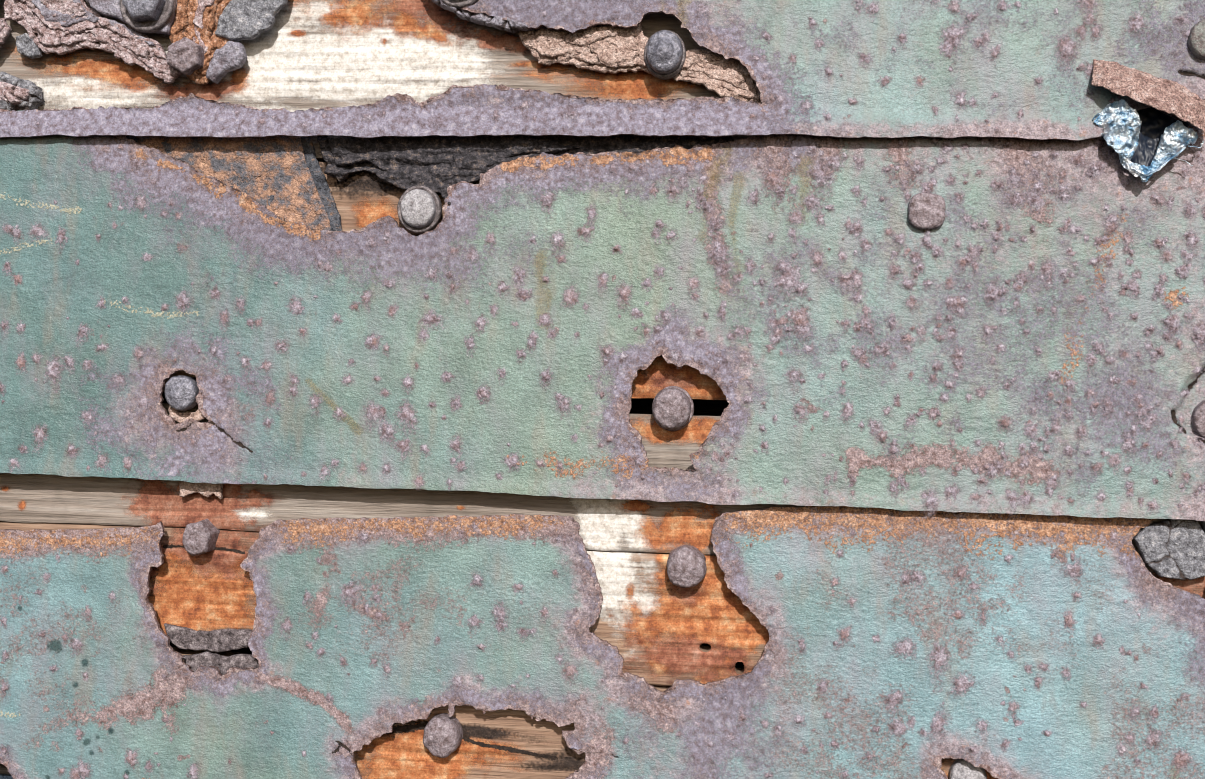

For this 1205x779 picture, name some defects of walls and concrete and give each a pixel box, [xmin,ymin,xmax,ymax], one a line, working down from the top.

peeling [220,2,498,112]
peeling [31,77,164,109]
rust [1070,136,1129,188]
rust [885,228,948,309]
rust [1154,230,1199,278]
crack [176,421,253,452]
rust [906,408,964,432]
crack [1171,370,1205,443]
peeling [235,509,268,518]
rust [0,274,596,779]
peeling [570,498,661,632]
rust [995,636,1071,689]